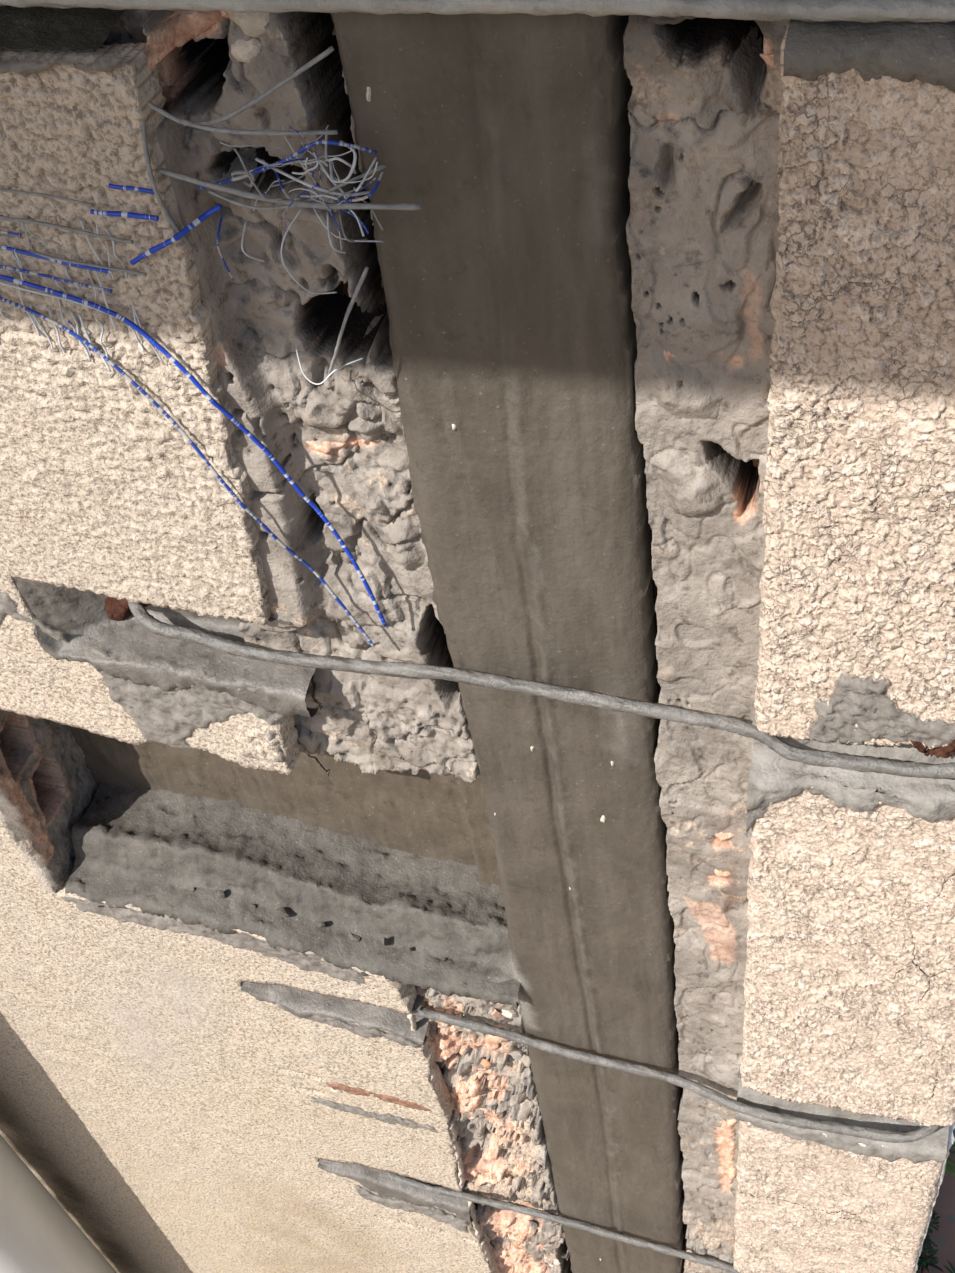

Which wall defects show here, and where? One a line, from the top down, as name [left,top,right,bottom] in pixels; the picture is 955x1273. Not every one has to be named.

spalling [145,10,229,90]
spalling [760,37,775,68]
spalling [306,438,370,455]
spalling [104,597,150,621]
flaking render [232,726,284,761]
spalling [910,739,955,758]
spalling [715,832,735,841]
spalling [430,1034,485,1114]
spalling [462,1143,513,1187]
spalling [721,1119,737,1185]
spalling [493,1199,547,1273]